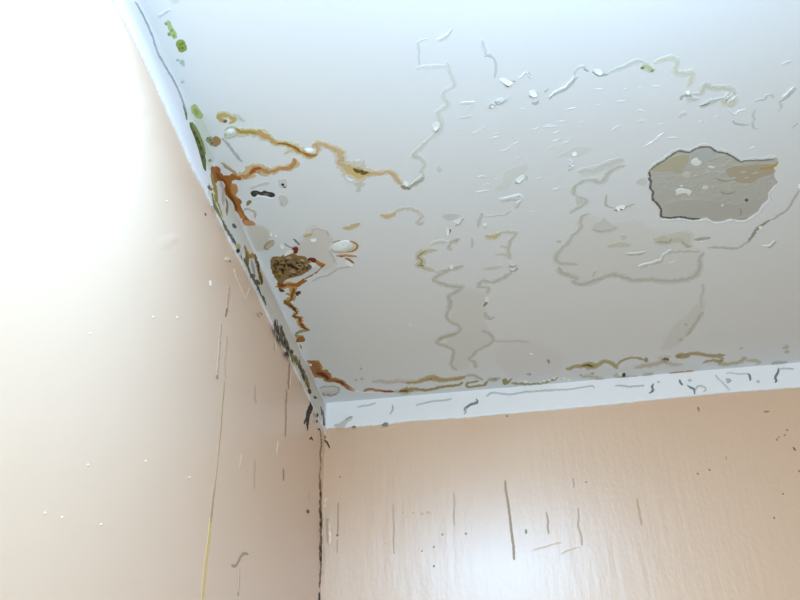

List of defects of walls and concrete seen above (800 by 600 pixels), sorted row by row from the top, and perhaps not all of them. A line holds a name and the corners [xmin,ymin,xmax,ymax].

mould [164,20,187,67]
leakage [183,104,216,171]
peeling [646,143,779,224]
leakage [380,206,425,226]
flaking render [269,233,321,284]
leakage [414,157,711,388]
mould [304,402,320,441]